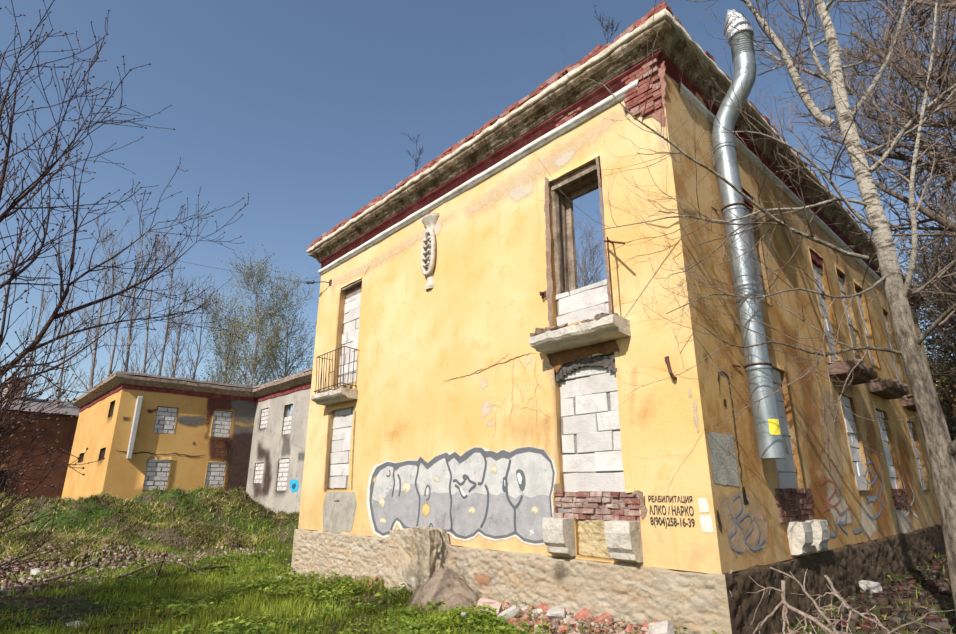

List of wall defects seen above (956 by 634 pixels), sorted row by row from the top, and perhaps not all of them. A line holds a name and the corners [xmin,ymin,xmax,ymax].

flaking render [621,58,666,148]
crack [448,353,550,436]
crack [116,450,206,463]